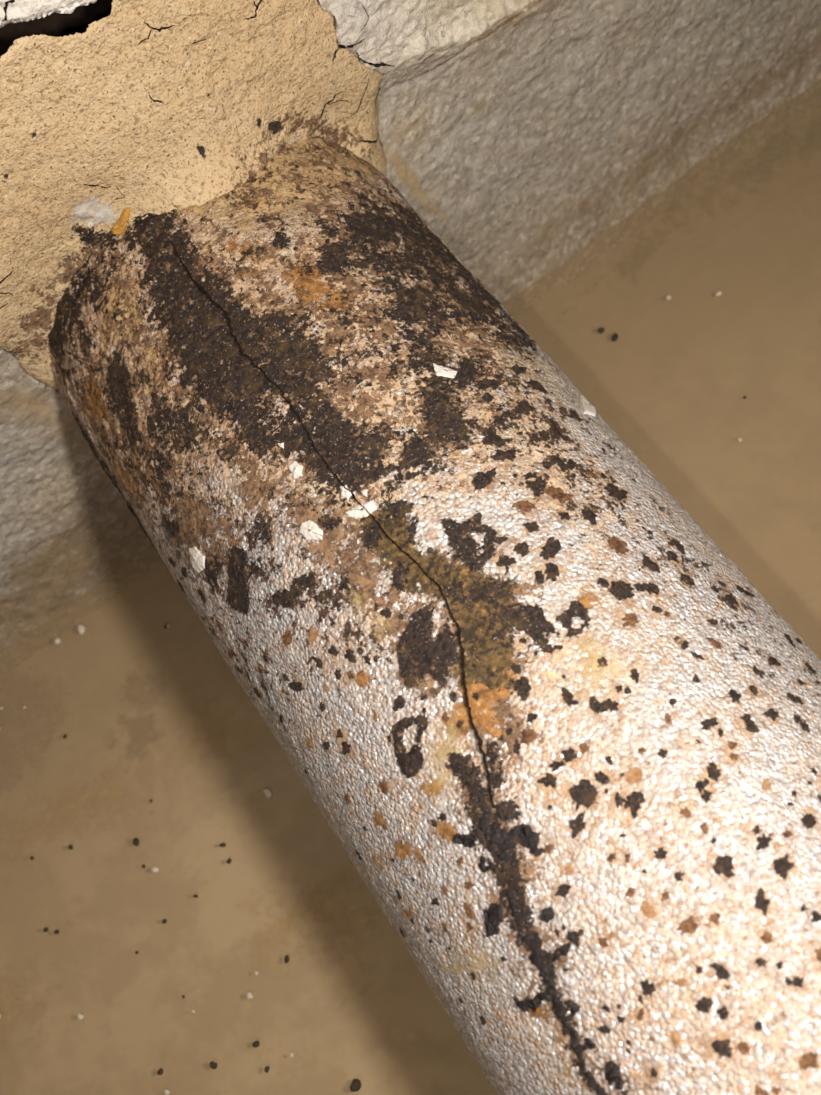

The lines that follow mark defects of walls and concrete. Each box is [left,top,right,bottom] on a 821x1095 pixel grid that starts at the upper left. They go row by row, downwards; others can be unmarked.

flaking render [0,0,387,391]
leakage [226,114,361,190]
rust [274,111,378,178]
rust [5,153,758,1095]
crack [170,240,624,1095]
rust [726,635,773,665]